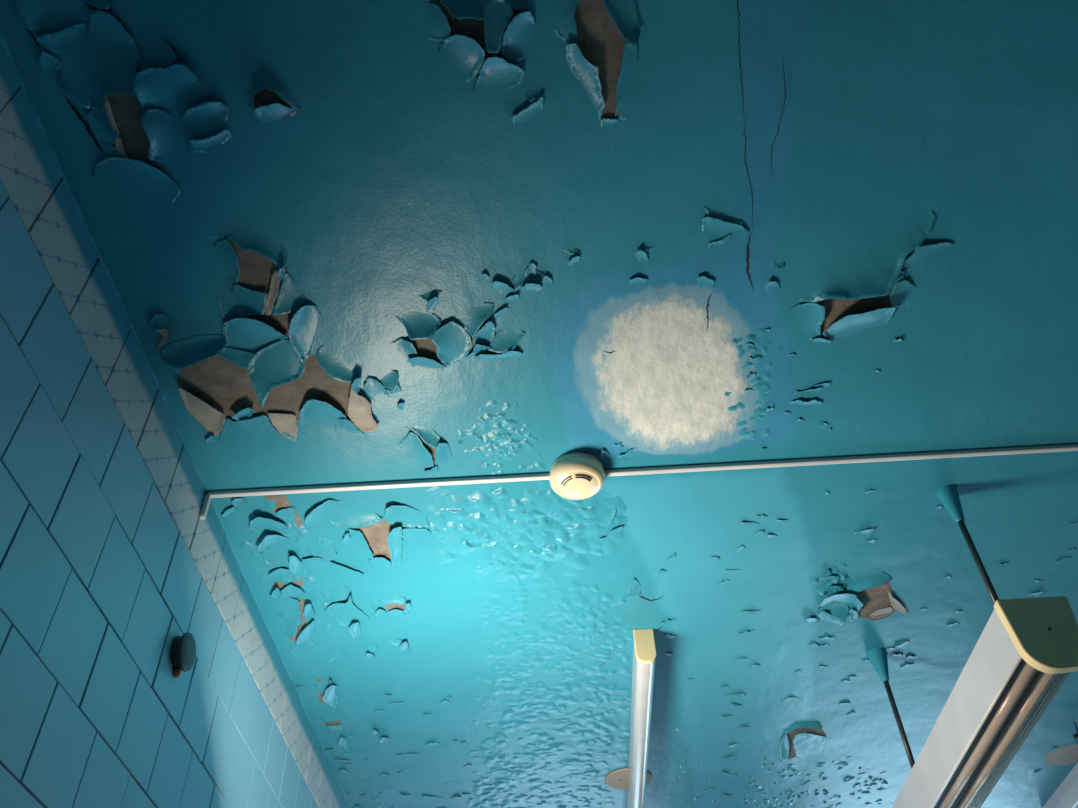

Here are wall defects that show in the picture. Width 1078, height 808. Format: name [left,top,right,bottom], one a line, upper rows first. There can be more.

peeling [13,0,231,201]
peeling [246,69,302,124]
peeling [425,0,544,124]
peeling [550,0,641,127]
crack [737,0,786,291]
peeling [150,228,405,444]
peeling [391,262,554,371]
peeling [787,209,954,344]
peeling [399,426,452,474]
peeling [221,495,432,660]
peeling [804,570,927,648]
peeling [779,721,826,762]